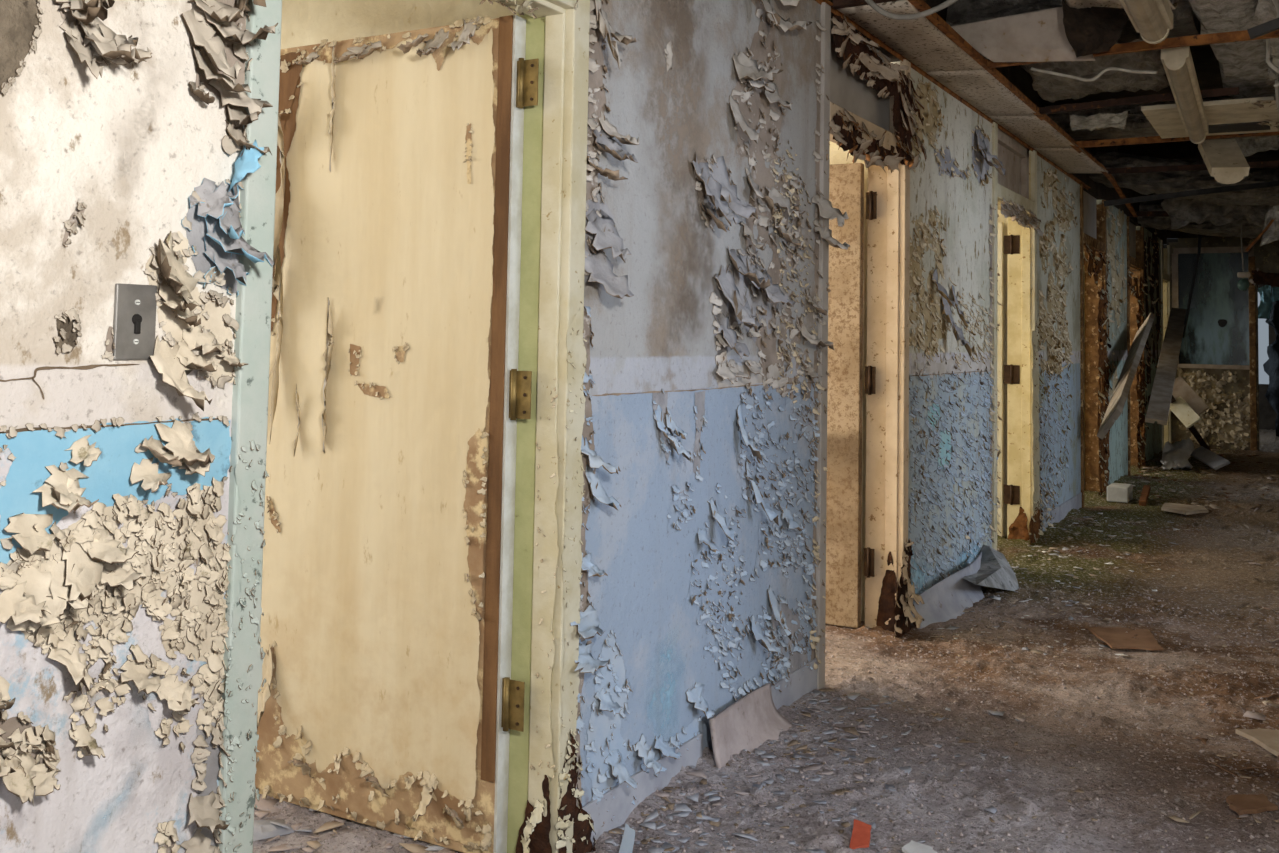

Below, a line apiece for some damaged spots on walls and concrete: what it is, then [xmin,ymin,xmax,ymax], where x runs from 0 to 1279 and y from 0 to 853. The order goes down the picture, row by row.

peeling [575,0,639,299]
crack [0,364,228,433]
peeling [0,0,551,853]
peeling [652,0,1006,701]
peeling [908,168,1078,604]
rust [1084,243,1112,496]
peeling [1177,368,1259,450]
peeling [530,301,720,853]
rust [515,729,596,853]
peeling [902,840,937,853]